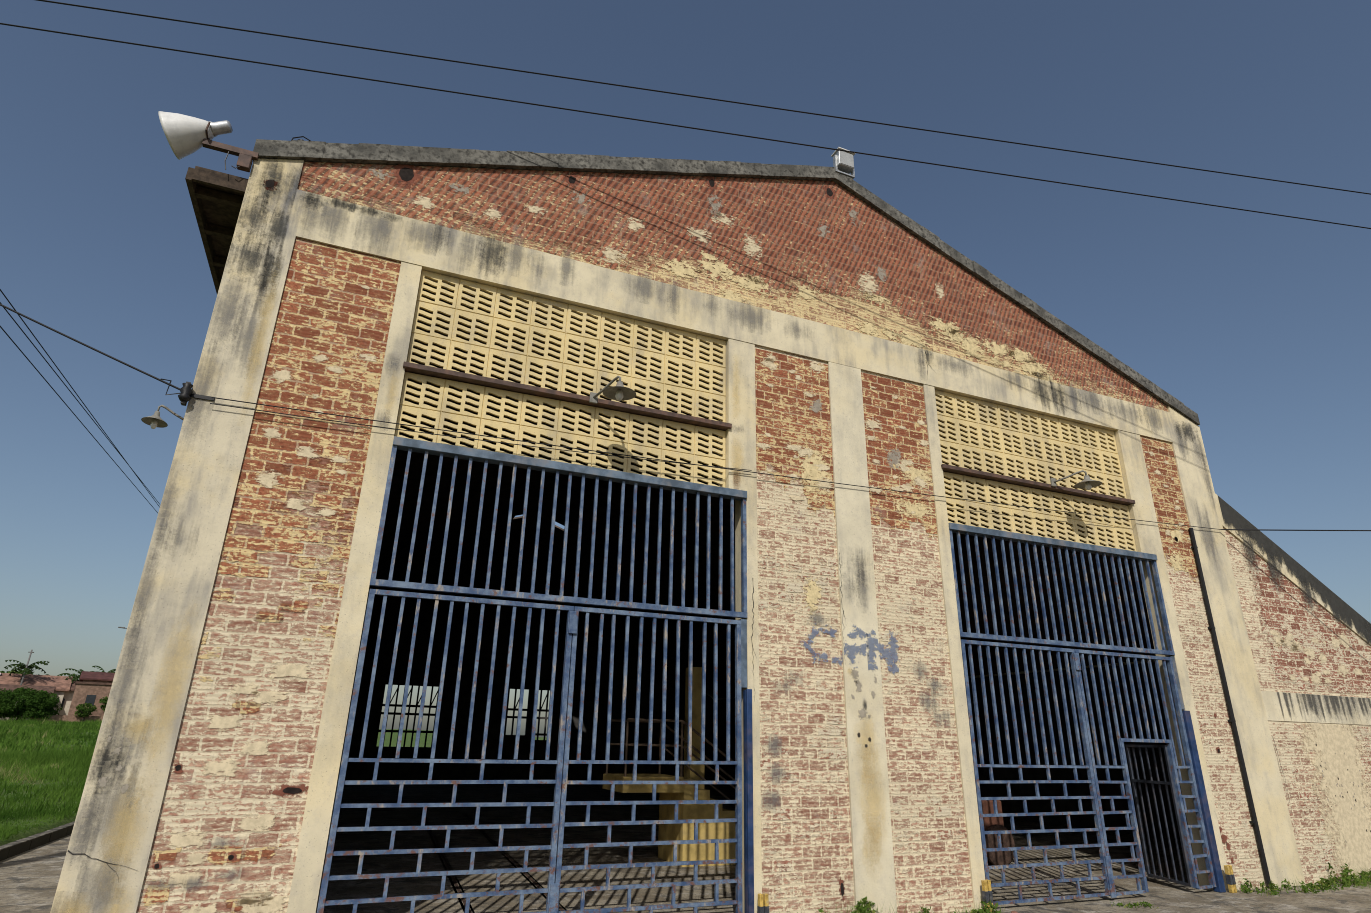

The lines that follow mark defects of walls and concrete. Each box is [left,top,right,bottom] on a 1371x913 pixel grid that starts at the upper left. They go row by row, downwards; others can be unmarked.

damp [239,163,394,301]
damp [468,236,520,270]
peeling [298,162,1167,411]
damp [1177,424,1202,451]
damp [1207,475,1371,645]
damp [1277,692,1371,718]
crack [68,850,137,880]